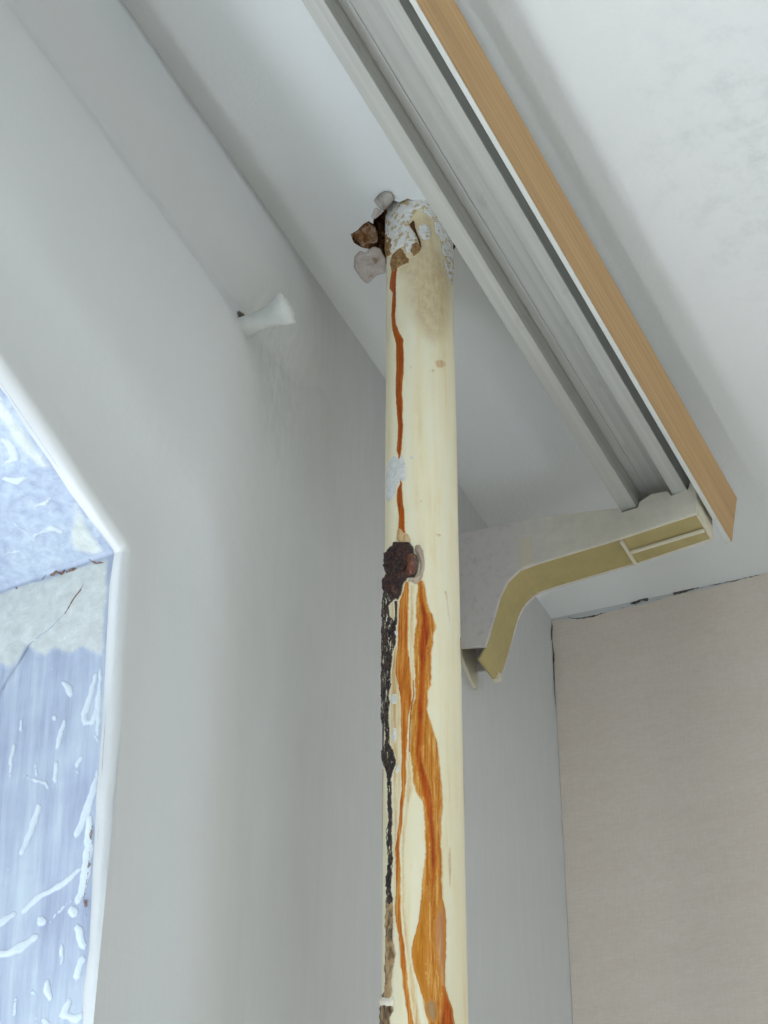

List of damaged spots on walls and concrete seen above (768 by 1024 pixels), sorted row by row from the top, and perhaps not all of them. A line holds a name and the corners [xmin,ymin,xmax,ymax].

peeling [351,191,455,284]
rust [387,209,453,459]
rust [396,480,406,533]
rust [378,581,455,1024]